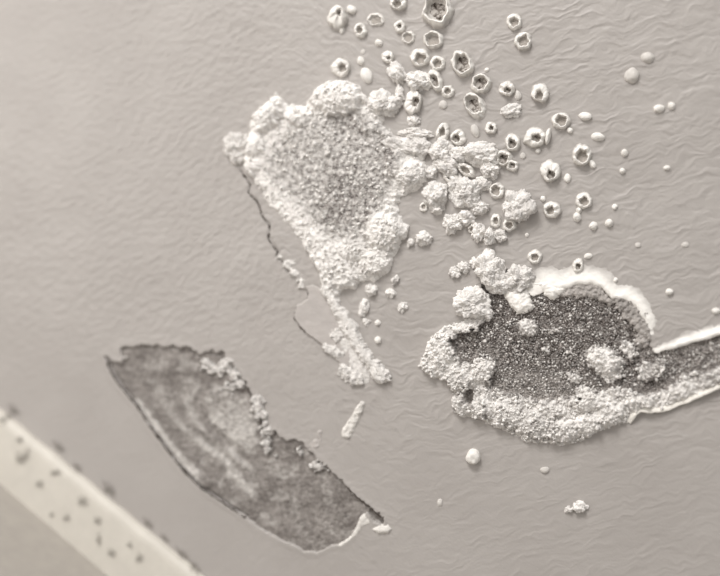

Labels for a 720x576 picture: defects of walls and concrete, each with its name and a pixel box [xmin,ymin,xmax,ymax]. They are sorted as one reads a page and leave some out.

crack [238,165,287,271]
efflorescence [222,80,427,386]
peeling [106,344,392,552]
spalling [418,247,720,446]